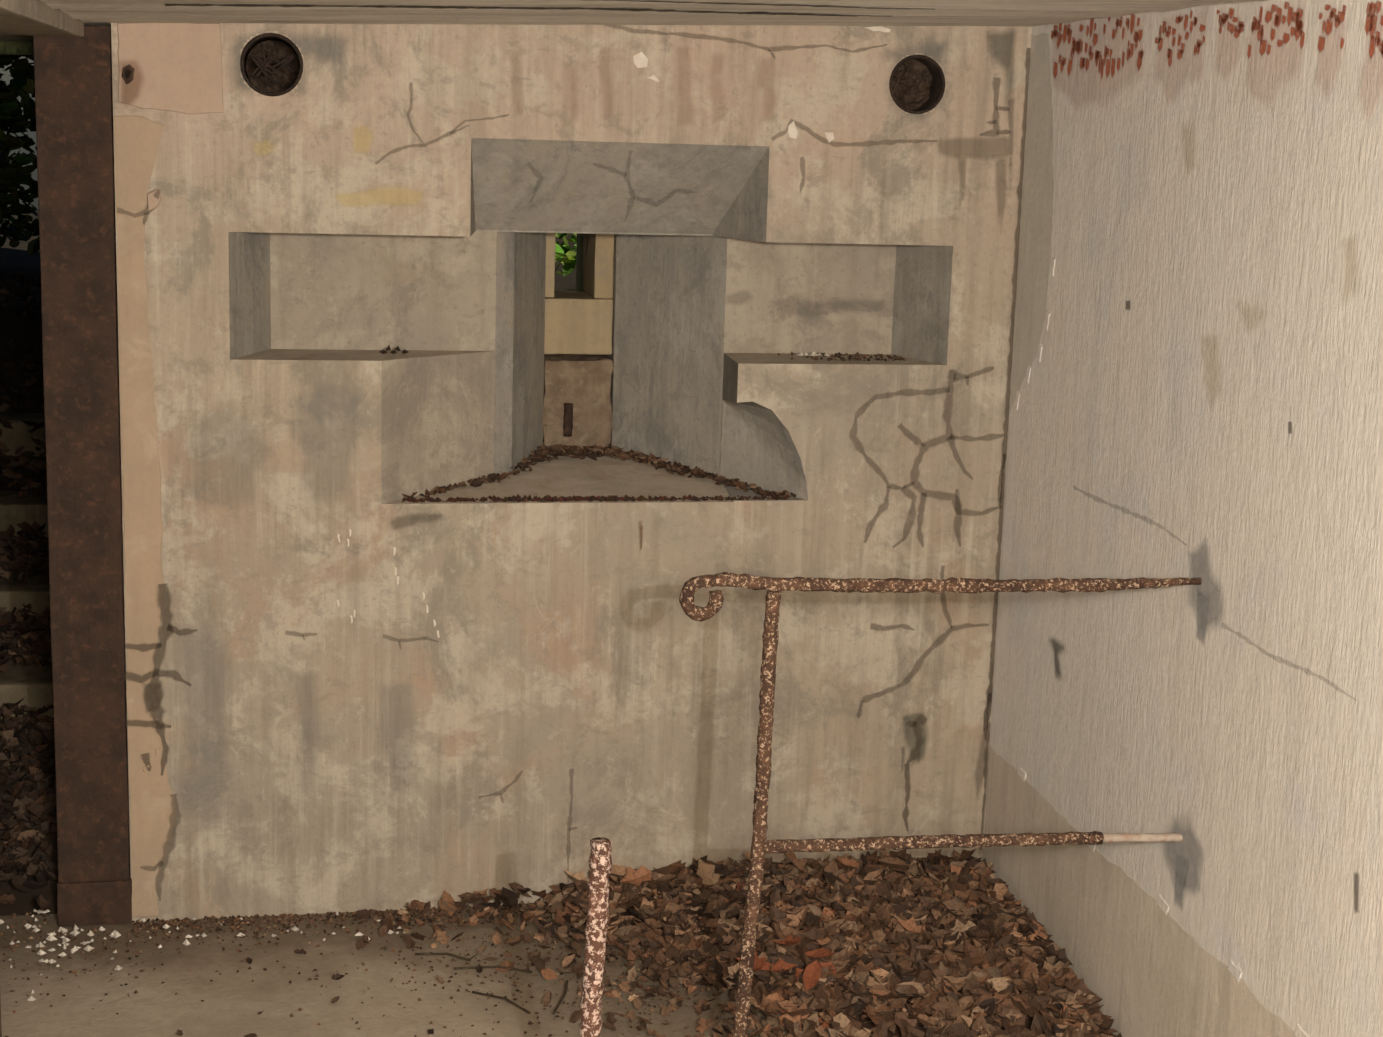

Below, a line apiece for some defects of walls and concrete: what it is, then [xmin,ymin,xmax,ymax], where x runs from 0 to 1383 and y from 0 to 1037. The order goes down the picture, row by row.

corrosion [1051,2,1346,79]
corrosion [1365,1,1383,58]
water stain [1193,550,1218,640]
crack [125,583,198,776]
water stain [1170,828,1198,904]